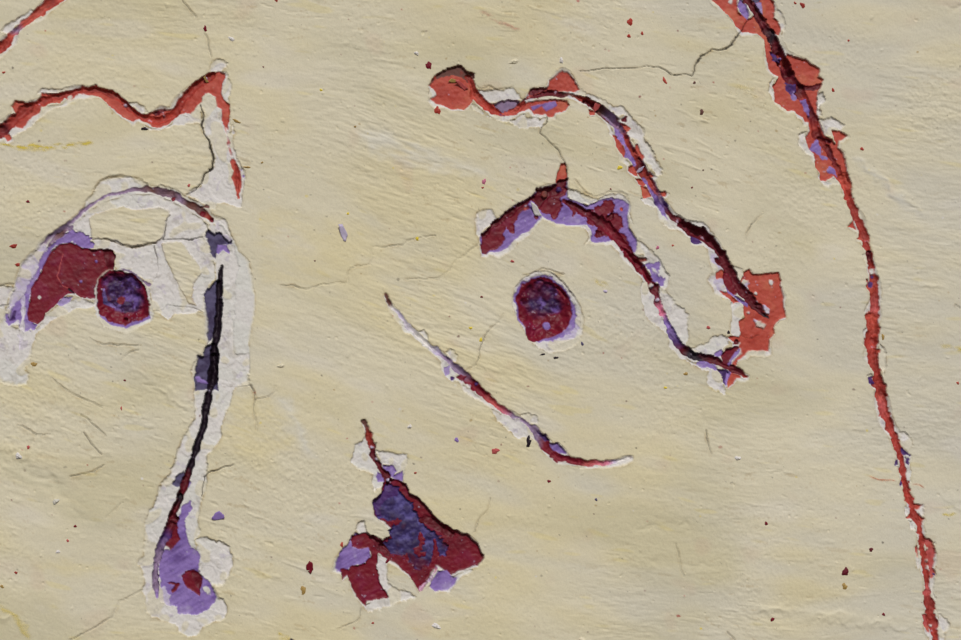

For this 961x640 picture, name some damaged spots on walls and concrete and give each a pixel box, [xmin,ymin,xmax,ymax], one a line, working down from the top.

peeling [188,95,246,210]
peeling [0,223,116,387]
crack [383,0,950,640]
peeling [331,419,485,613]